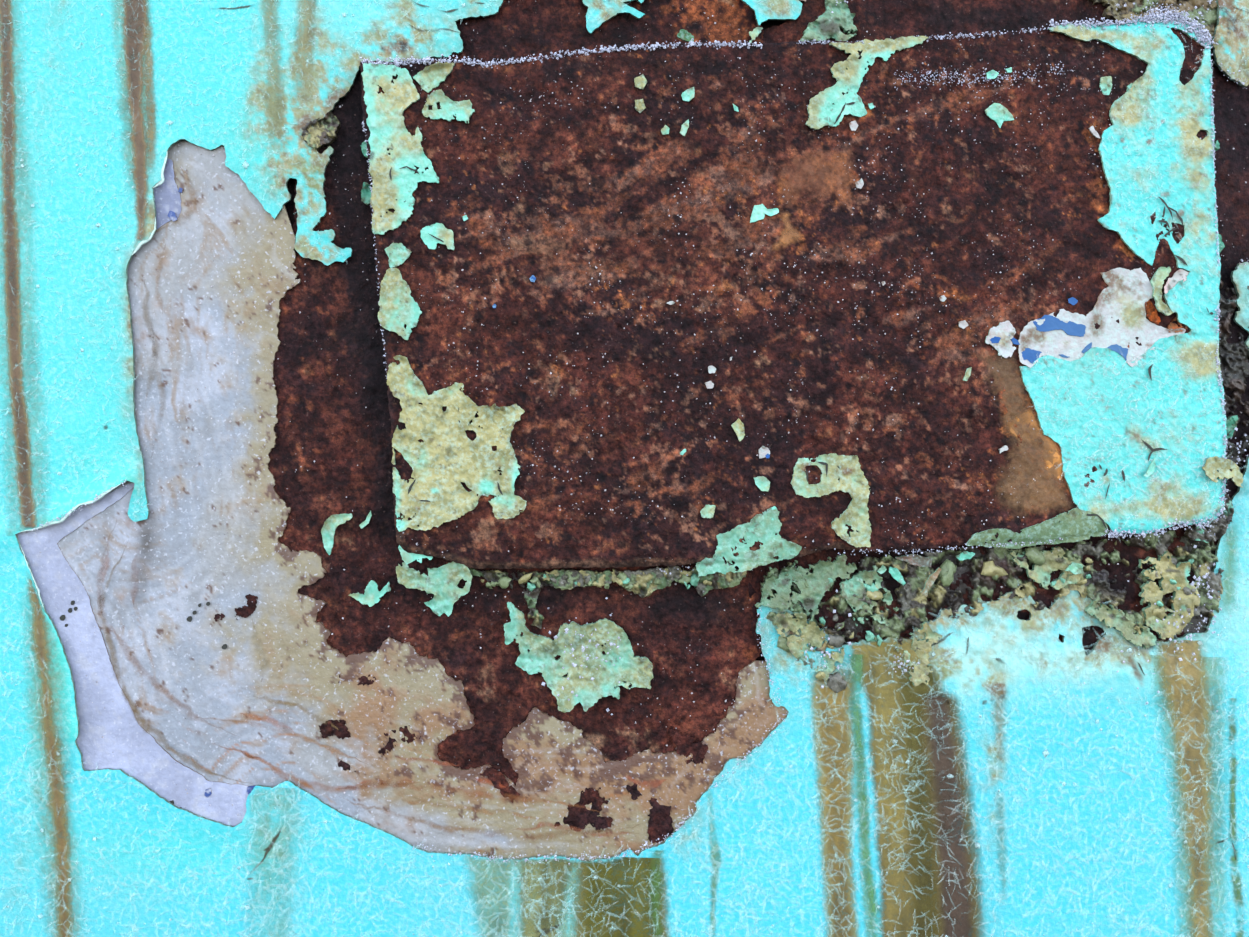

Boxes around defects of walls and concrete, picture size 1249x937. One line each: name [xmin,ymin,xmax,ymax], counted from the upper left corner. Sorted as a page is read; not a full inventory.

rust [0,0,35,528]
rust [122,0,155,240]
rust [265,0,283,125]
peeling [361,61,475,340]
peeling [800,0,929,131]
peeling [985,103,1014,128]
rust [214,594,258,622]
peeling [17,140,802,860]
rust [268,0,1249,937]
peeling [791,453,872,547]
peeling [966,508,1109,549]
rust [29,580,73,937]